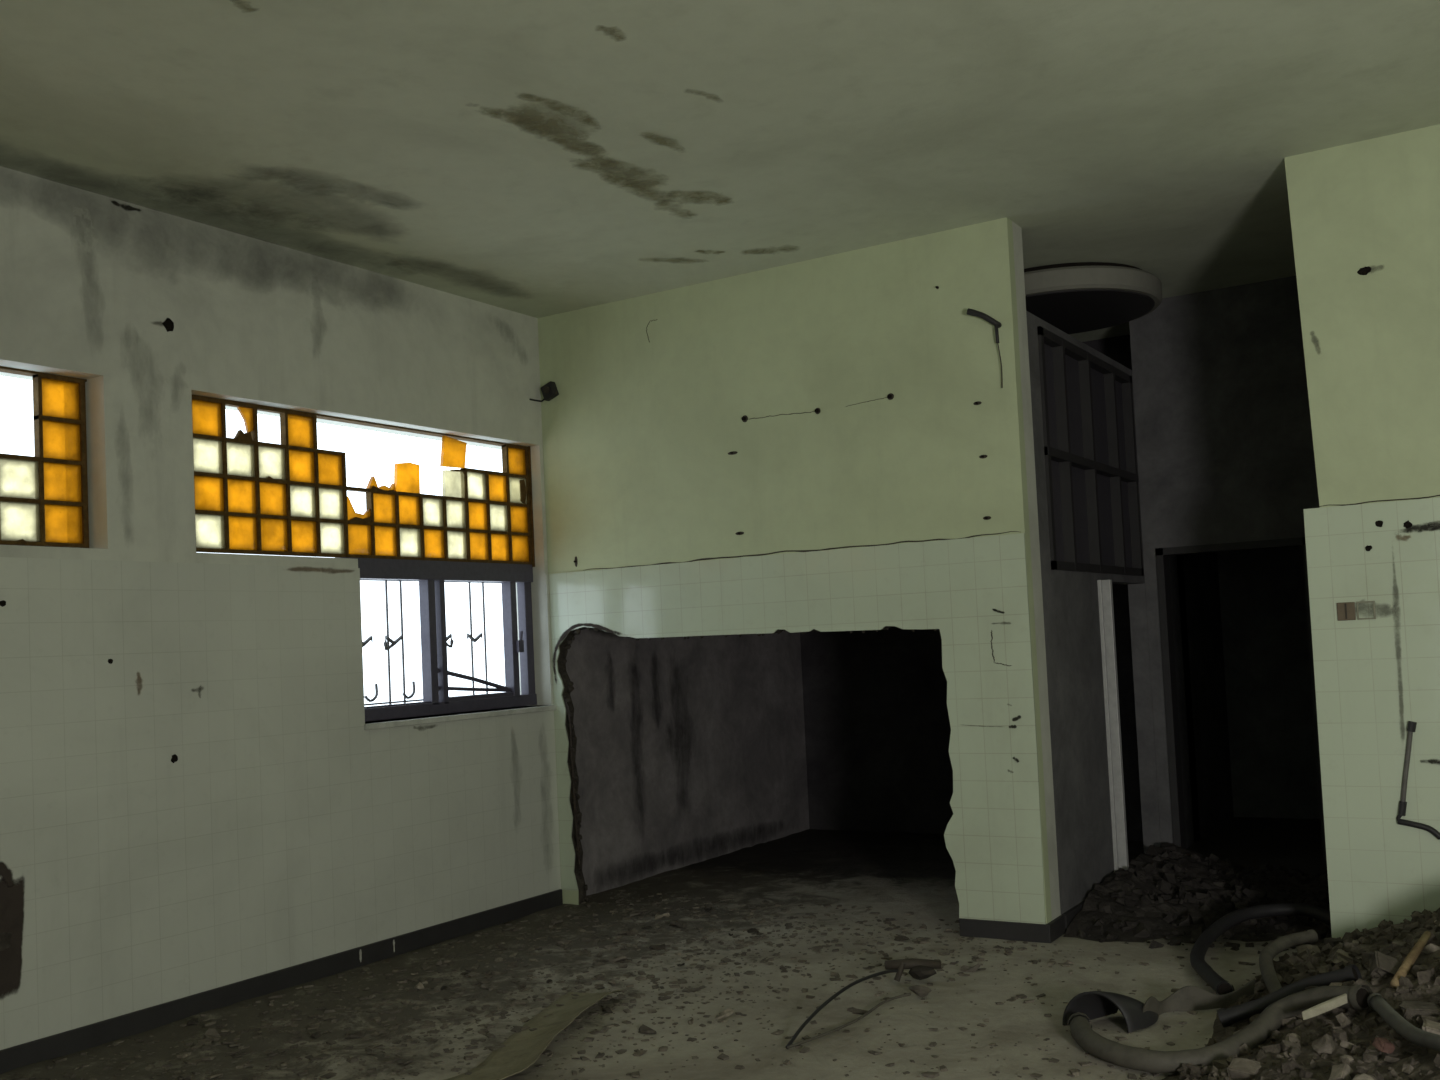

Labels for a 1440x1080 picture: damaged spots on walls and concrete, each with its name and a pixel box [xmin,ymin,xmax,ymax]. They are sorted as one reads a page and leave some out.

spalling [553,623,664,902]
peeling [0,862,24,998]